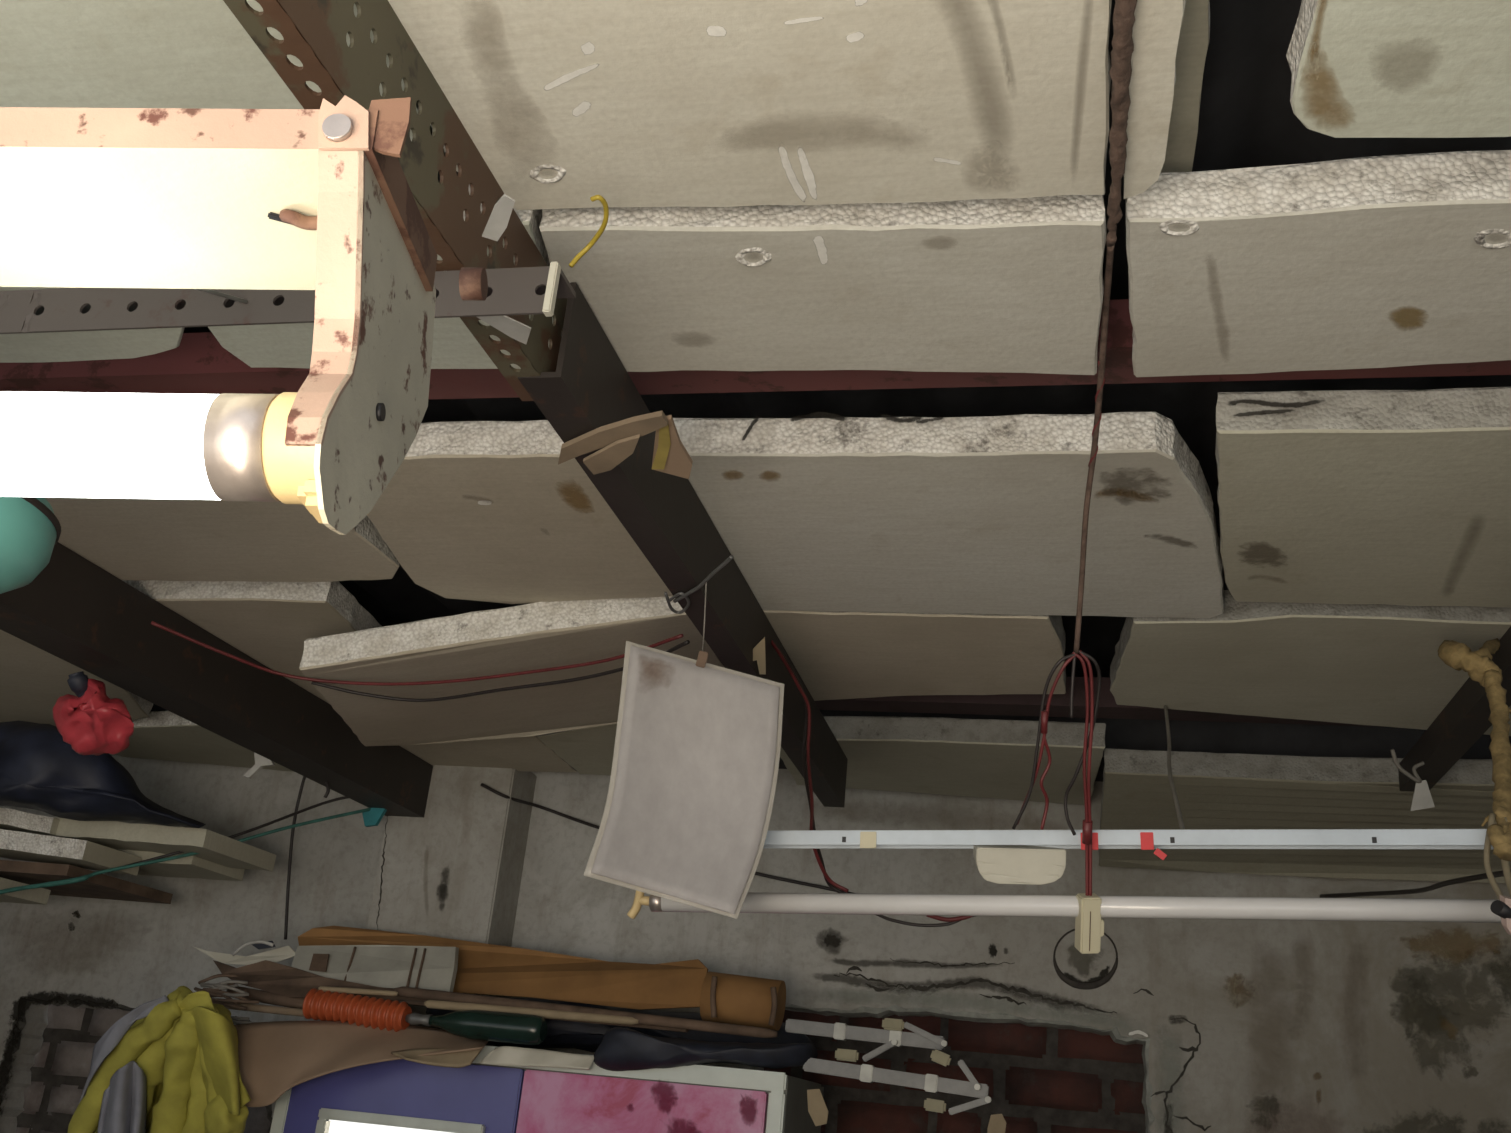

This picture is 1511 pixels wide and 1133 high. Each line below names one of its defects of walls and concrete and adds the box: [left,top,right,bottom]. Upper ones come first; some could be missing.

damp [1394,309,1422,327]
spalling [750,1004,1155,1133]
crack [822,958,1211,1133]